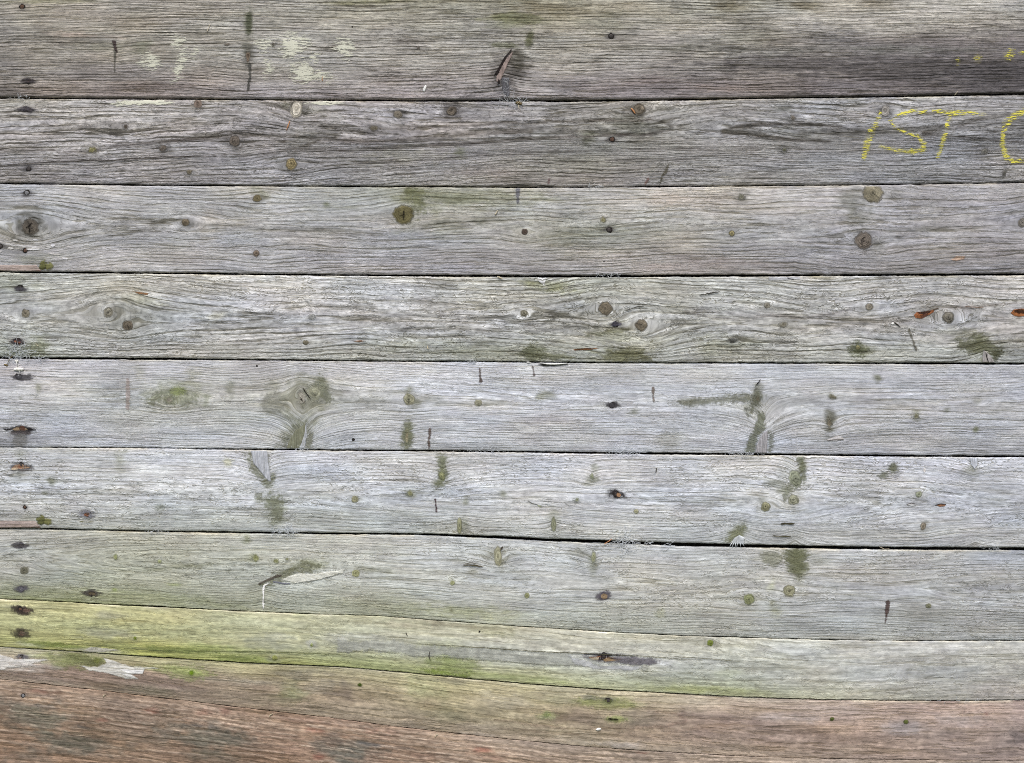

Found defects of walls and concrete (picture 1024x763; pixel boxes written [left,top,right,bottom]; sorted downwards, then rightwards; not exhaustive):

water stain [11,605,34,615]
water stain [13,628,30,638]
water stain [9,654,46,666]
water stain [69,647,116,665]